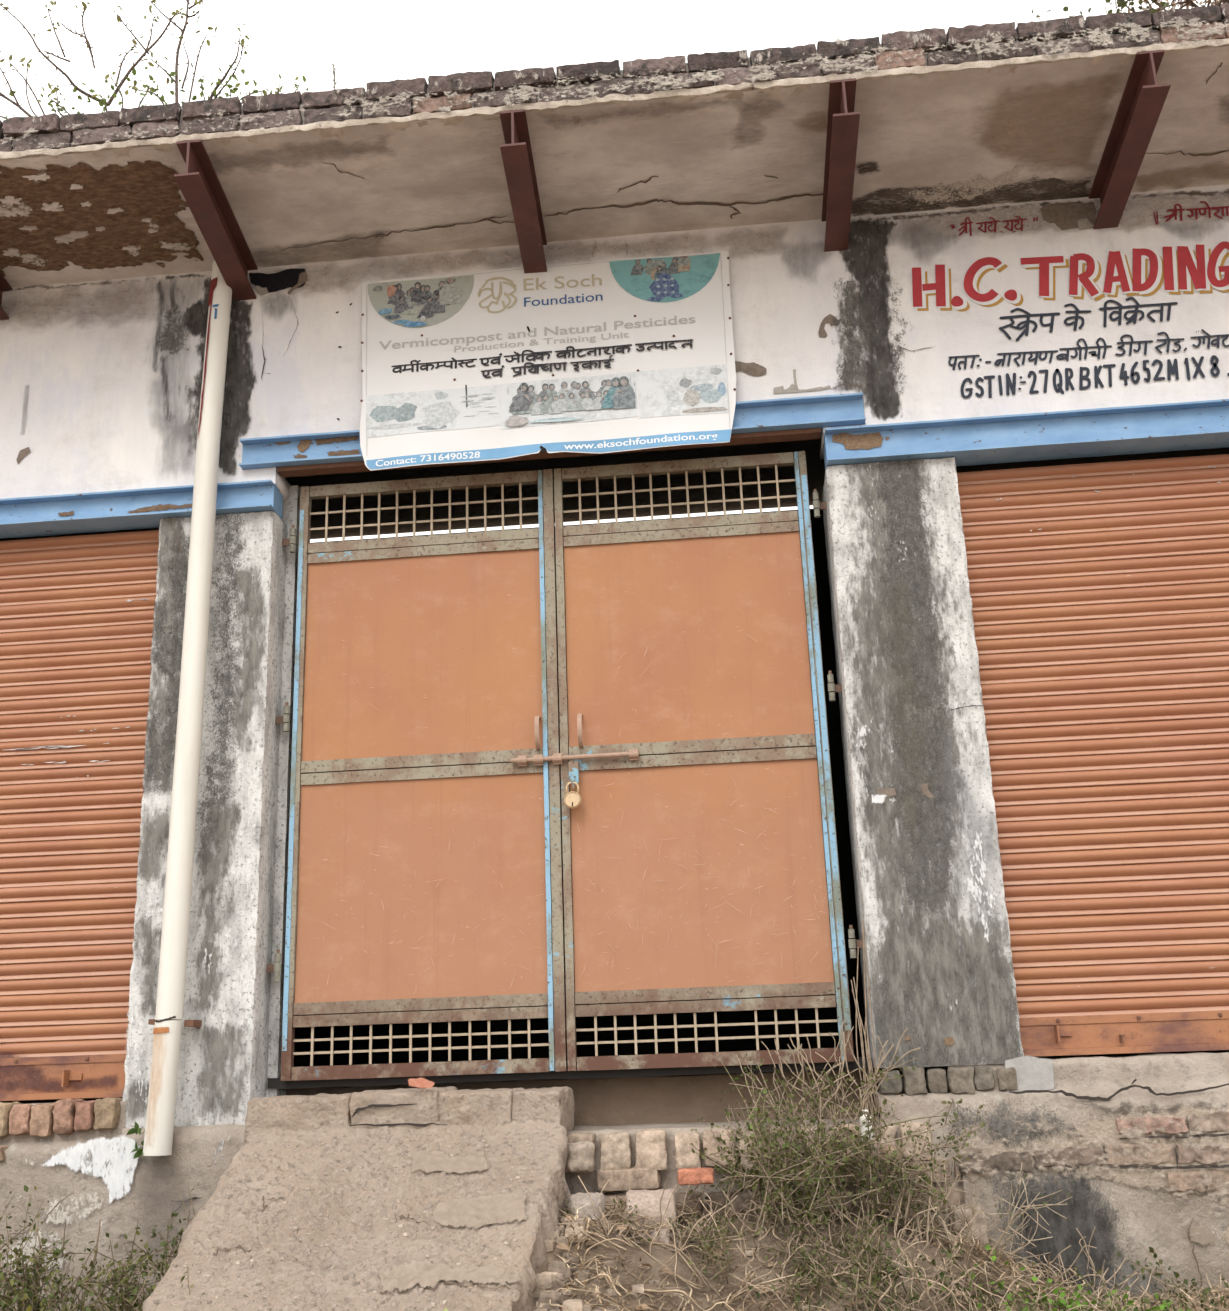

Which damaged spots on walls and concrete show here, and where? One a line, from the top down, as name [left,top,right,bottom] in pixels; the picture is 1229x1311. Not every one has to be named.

flaking render [0,160,203,276]
crack [281,175,823,251]
leakage [834,77,1114,420]
leakage [155,278,256,475]
leakage [138,517,190,887]
leakage [189,512,265,1011]
leakage [842,459,1023,1068]
leakage [134,918,162,1014]
leakage [197,1024,246,1114]
crack [1009,1079,1229,1169]
peeling [4,1135,140,1278]
crack [1188,1218,1202,1288]